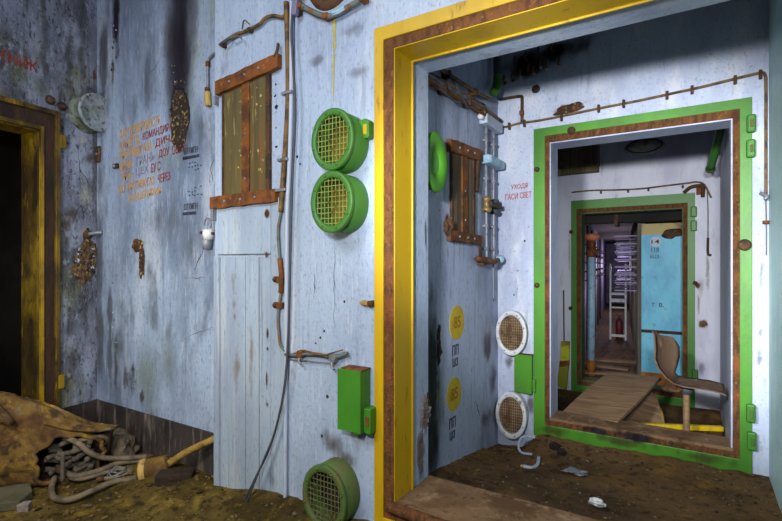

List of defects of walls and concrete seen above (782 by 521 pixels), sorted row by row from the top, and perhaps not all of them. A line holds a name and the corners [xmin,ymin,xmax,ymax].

leakage [100,0,119,97]
leakage [97,295,134,389]
leakage [428,319,439,475]